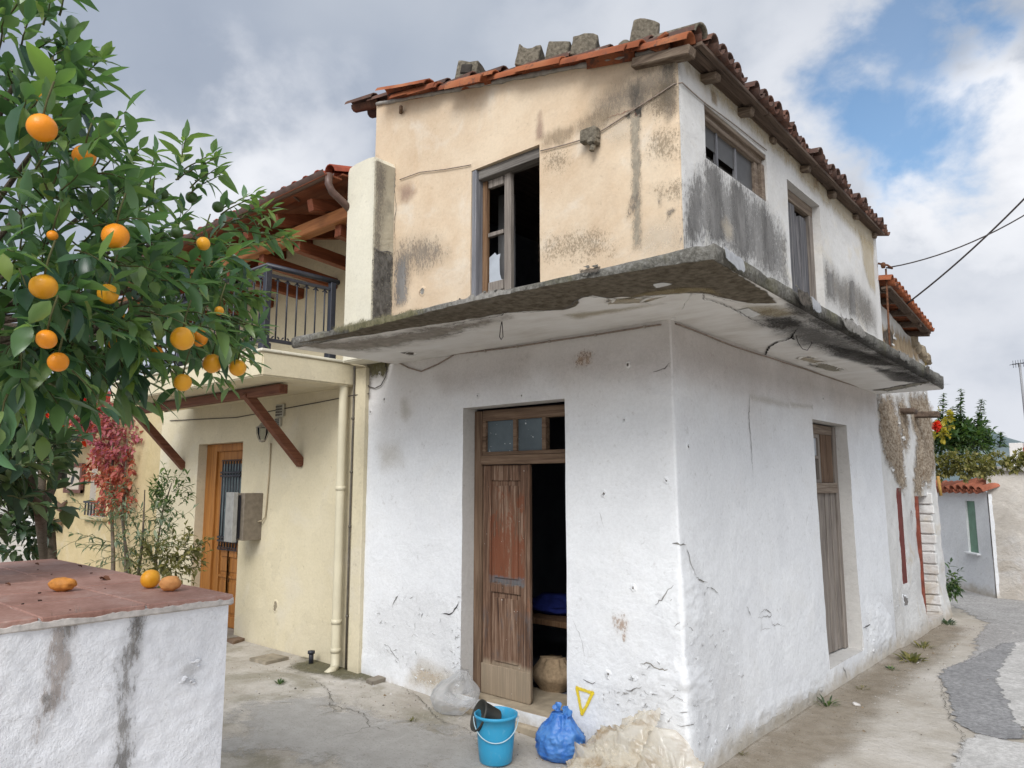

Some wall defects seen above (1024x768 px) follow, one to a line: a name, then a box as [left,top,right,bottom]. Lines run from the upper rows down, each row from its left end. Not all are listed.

leakage [552,66,672,245]
crack [412,293,797,355]
leakage [300,158,939,385]
spalling [604,296,666,305]
leakage [38,626,71,727]
leakage [113,616,143,768]
crack [310,677,380,740]